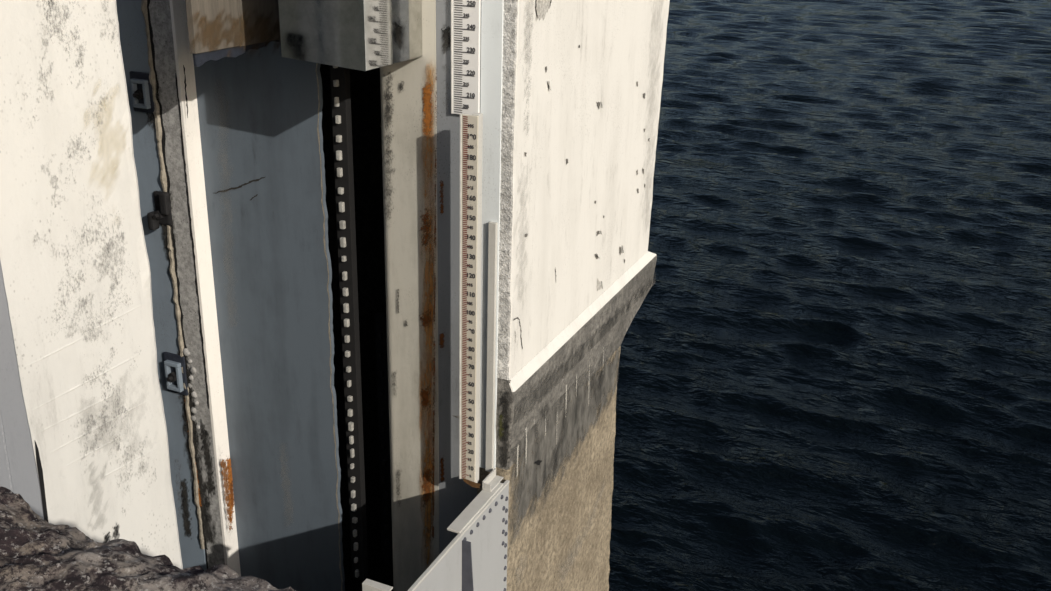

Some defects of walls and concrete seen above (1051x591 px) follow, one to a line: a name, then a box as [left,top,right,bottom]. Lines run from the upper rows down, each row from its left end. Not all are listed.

peeling [535,0,551,21]
rust [220,458,234,530]
rust [420,68,445,565]
water stain [499,282,655,540]